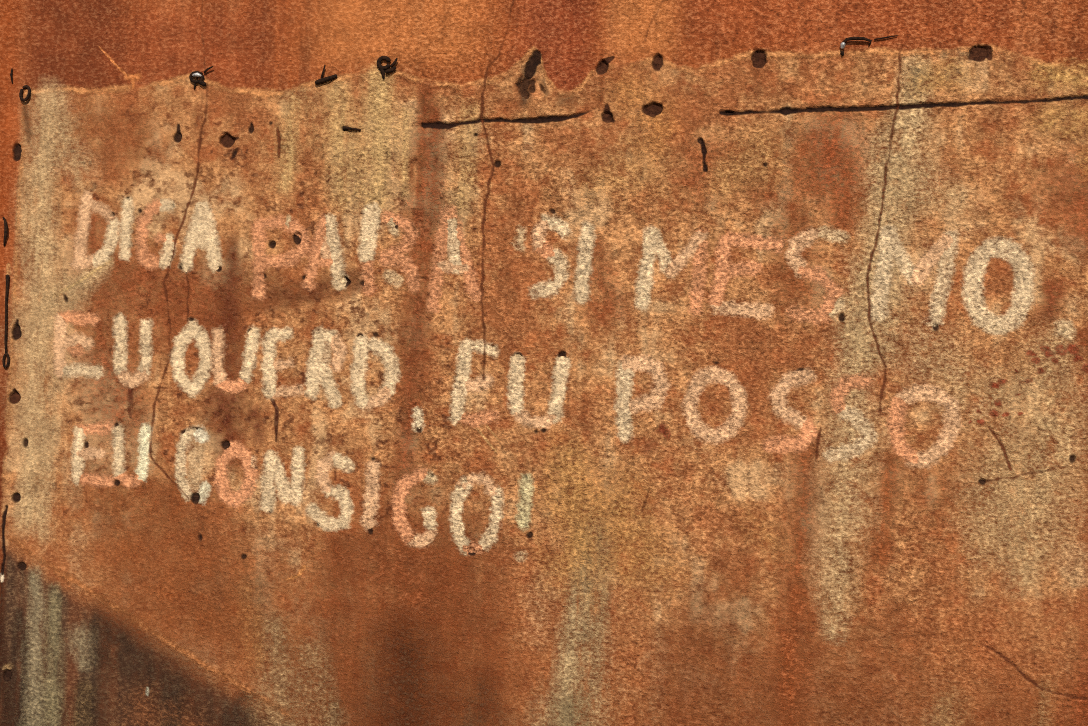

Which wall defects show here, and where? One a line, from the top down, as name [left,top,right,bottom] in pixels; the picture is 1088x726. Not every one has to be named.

crack [421,72,588,380]
corrosion [756,114,856,224]
crack [719,56,1088,413]
corrosion [270,398,279,442]
corrosion [969,401,1023,424]
corrosion [1026,336,1088,373]
damp [0,572,60,726]
damp [96,475,250,644]
damp [101,507,489,726]
corrosion [777,445,822,723]